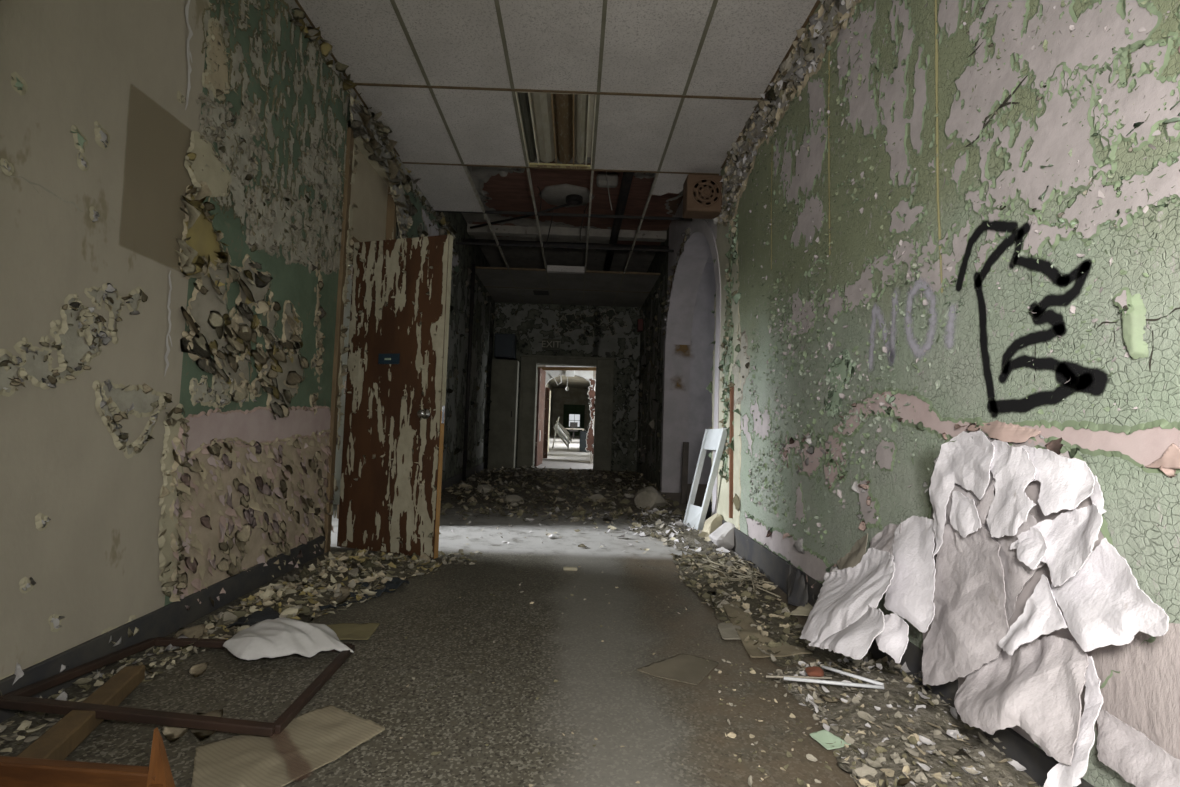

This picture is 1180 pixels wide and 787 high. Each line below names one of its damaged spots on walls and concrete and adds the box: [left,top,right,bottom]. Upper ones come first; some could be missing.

peeling [0,658,46,696]
peeling [101,615,139,647]
peeling [0,0,460,597]
peeling [670,0,1180,787]